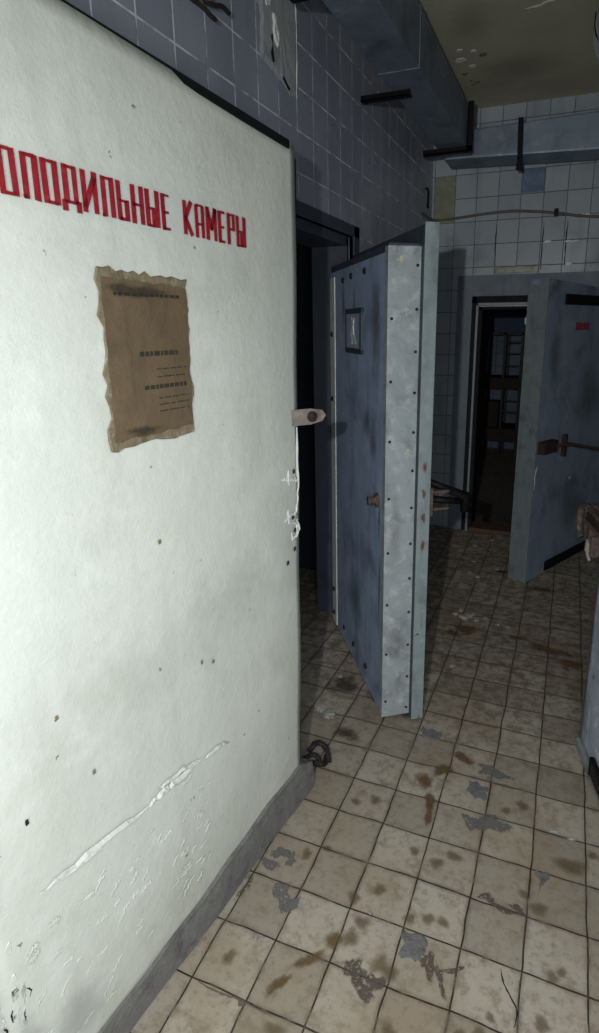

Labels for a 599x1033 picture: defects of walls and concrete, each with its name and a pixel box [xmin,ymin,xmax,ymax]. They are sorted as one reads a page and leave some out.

flaking render [259,0,297,97]
spalling [466,763,511,801]
spalling [462,813,512,832]
spalling [259,847,296,870]
spalling [273,882,300,914]
peeling [2,974,32,1033]
spalling [343,959,386,1003]
spalling [398,930,464,998]
crack [501,971,518,1028]